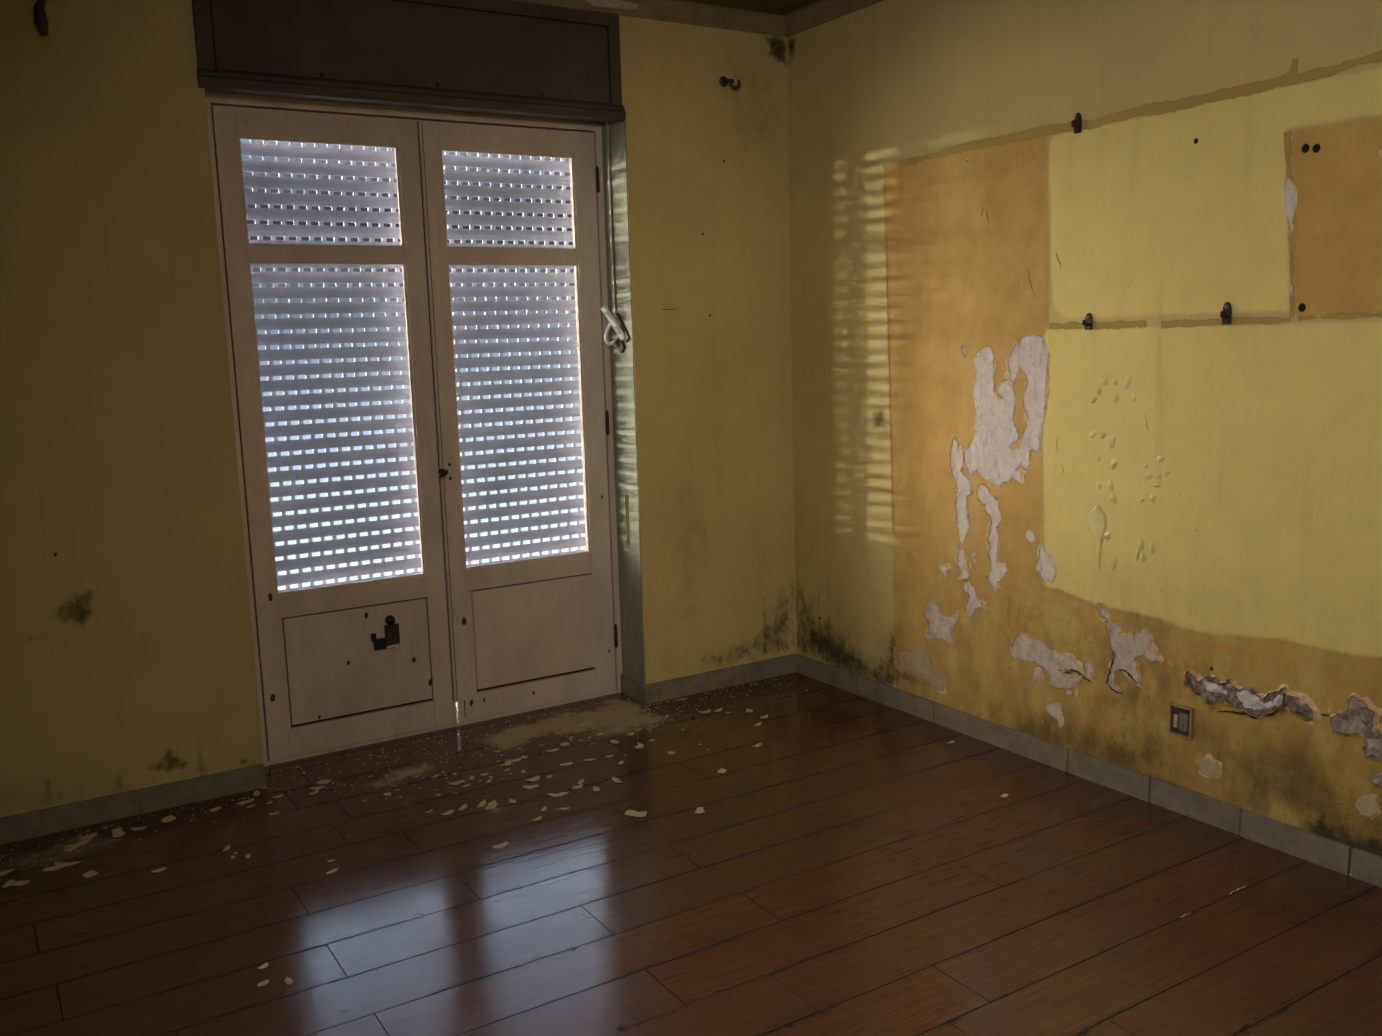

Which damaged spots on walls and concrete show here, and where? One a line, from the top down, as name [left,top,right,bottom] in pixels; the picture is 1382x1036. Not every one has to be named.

peeling [900,334,1051,694]
peeling [1026,530,1057,584]
leakage [801,618,894,684]
peeling [1007,603,1164,728]
spalling [1182,669,1382,820]
leakage [1309,808,1382,857]